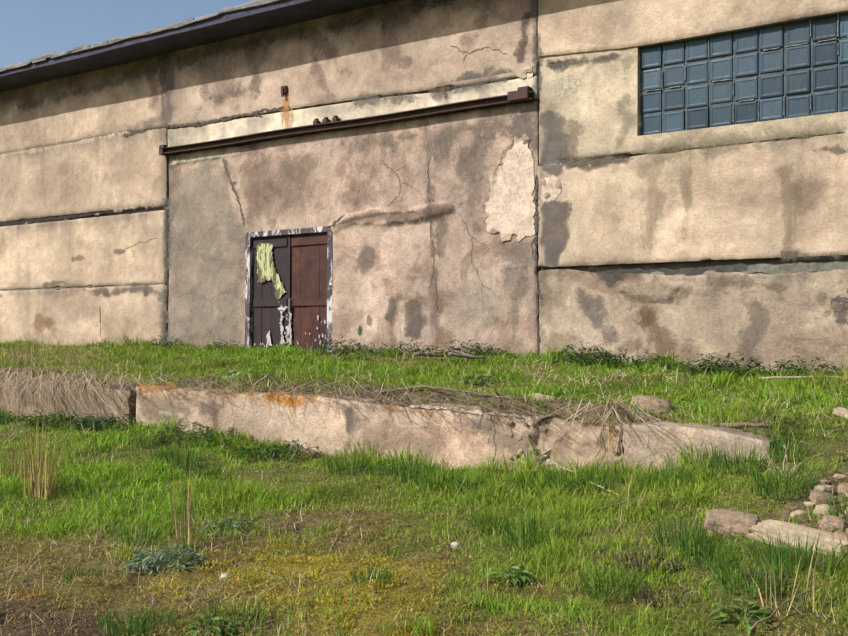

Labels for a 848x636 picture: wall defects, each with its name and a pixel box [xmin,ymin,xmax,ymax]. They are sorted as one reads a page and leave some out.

crack [451,46,508,60]
rust [281,86,292,128]
crack [222,159,245,226]
flaking render [482,133,562,243]
spalling [563,154,628,170]
water stain [540,201,572,265]
crack [461,219,495,314]